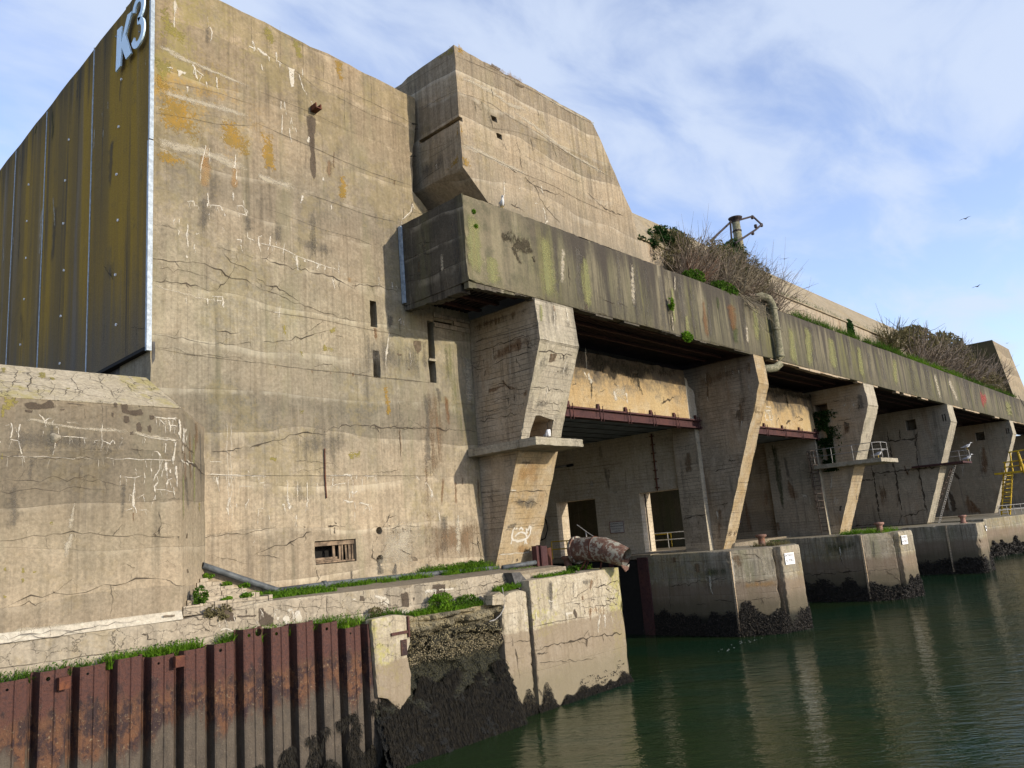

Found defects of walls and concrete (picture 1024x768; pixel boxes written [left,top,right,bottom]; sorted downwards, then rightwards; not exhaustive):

water stain [280,102,335,180]
crack [133,231,454,368]
water stain [512,240,591,326]
crack [183,334,576,475]
crack [0,368,528,651]
crack [510,486,547,507]
crack [856,430,935,527]
crack [499,579,622,695]